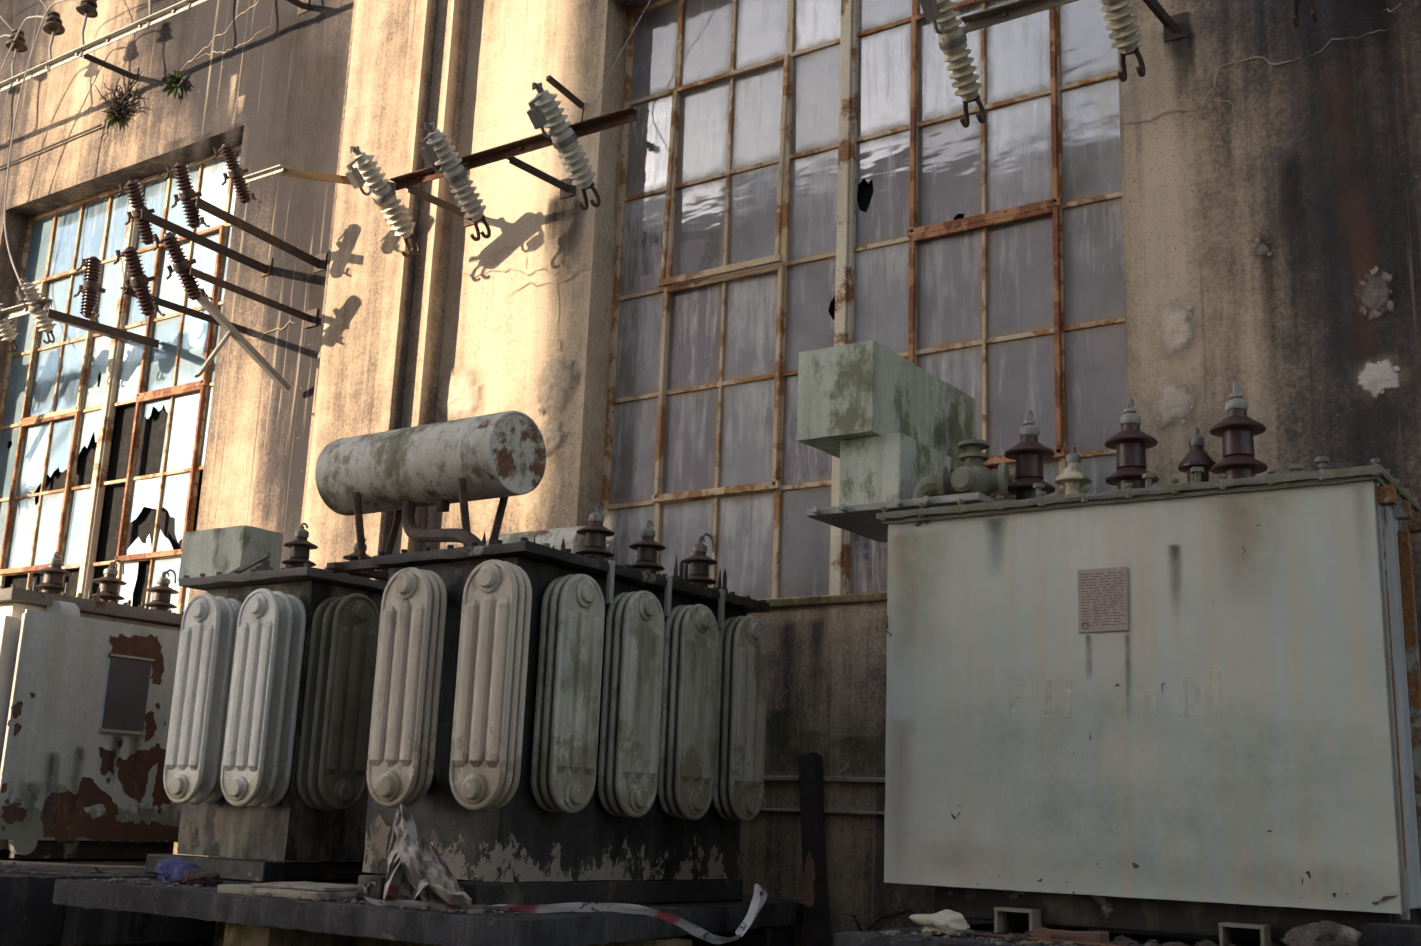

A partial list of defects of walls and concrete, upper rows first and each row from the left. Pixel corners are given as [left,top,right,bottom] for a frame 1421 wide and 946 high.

crack [1125,3,1401,124]
crack [453,247,589,330]
flaking render [1356,266,1394,320]